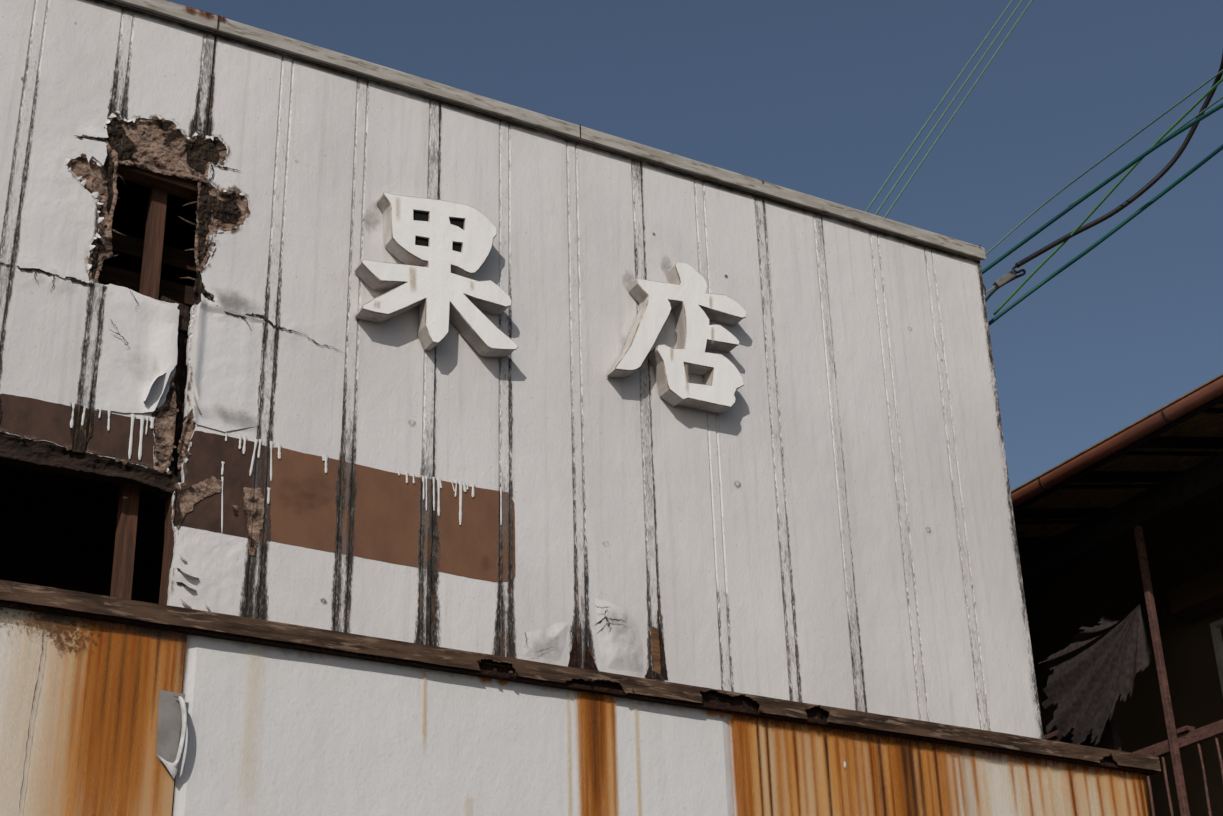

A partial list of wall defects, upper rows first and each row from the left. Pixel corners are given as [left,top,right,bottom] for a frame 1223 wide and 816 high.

leakage [0,34,39,378]
crack [0,262,95,291]
leakage [77,282,107,412]
peeling [0,109,265,529]
crack [216,305,344,353]
leakage [89,0,1044,739]
peeling [233,487,265,555]
crack [596,607,627,625]
rust [0,606,186,816]
rust [578,681,617,816]
rust [707,692,990,816]
rust [1009,756,1148,816]